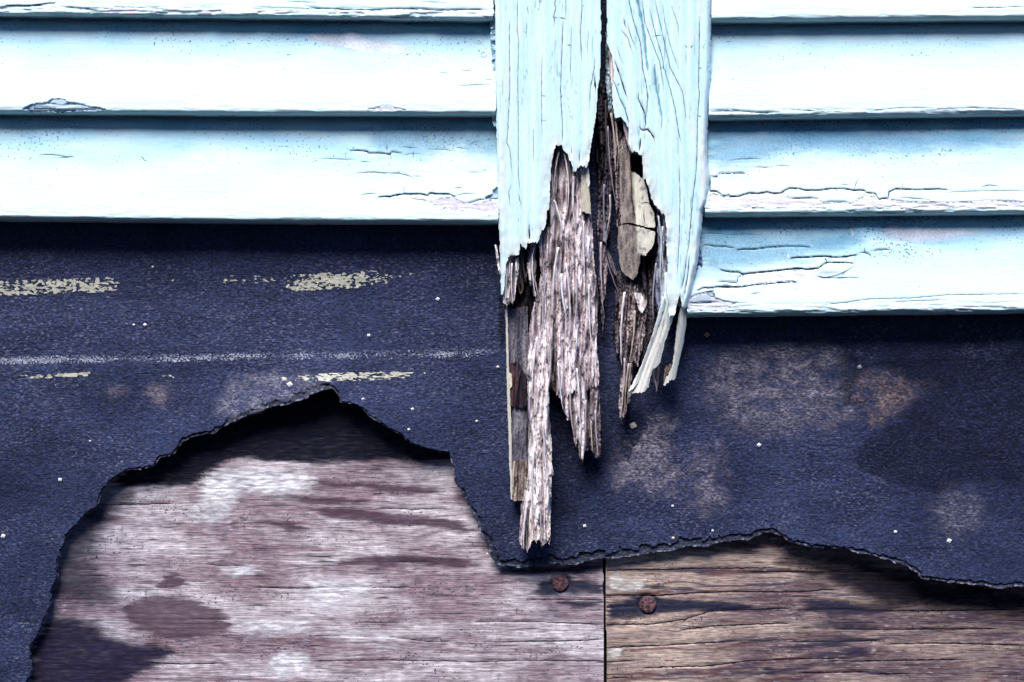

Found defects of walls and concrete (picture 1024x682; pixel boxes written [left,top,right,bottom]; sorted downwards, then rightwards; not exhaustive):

crack [323,0,1021,311]
peeling [581,167,591,214]
damp [710,346,1024,528]
damp [57,500,127,599]
damp [256,521,308,529]
damp [273,480,478,532]
damp [338,555,475,567]
damp [695,462,722,516]
damp [29,573,231,682]